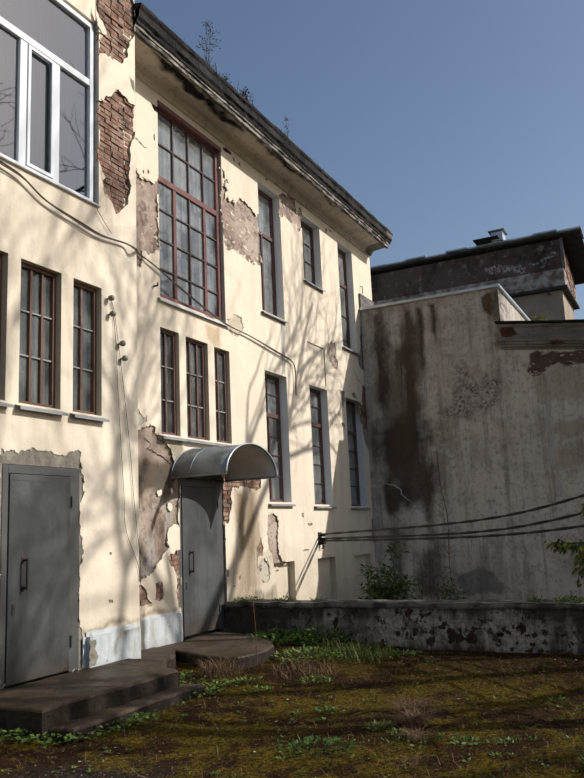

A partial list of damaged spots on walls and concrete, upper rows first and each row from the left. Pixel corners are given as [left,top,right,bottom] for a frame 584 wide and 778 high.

flaking render [95,0,135,63]
flaking render [96,89,161,267]
flaking render [219,167,262,265]
flaking render [278,193,302,231]
flaking render [485,252,576,298]
peeling [227,314,243,336]
flaking render [328,342,337,369]
flaking render [528,340,584,376]
leakage [374,304,436,514]
flaking render [138,410,182,608]
flaking render [222,477,260,525]
flaking render [257,511,286,583]